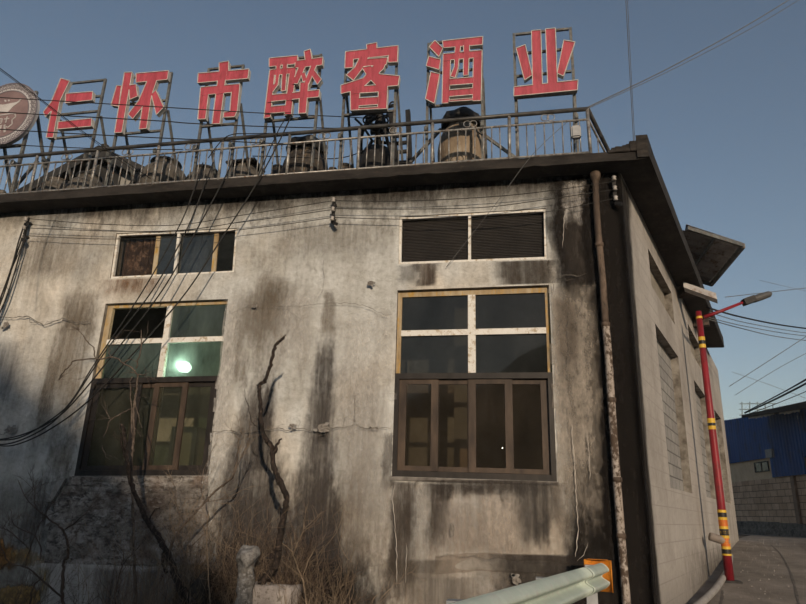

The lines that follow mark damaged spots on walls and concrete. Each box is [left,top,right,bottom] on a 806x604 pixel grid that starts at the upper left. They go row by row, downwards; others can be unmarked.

water stain [411,263,435,285]
water stain [501,260,553,284]
water stain [563,200,598,370]
crack [0,313,89,326]
crack [213,388,390,440]
water stain [215,348,368,604]
water stain [389,482,438,584]
water stain [426,480,558,541]